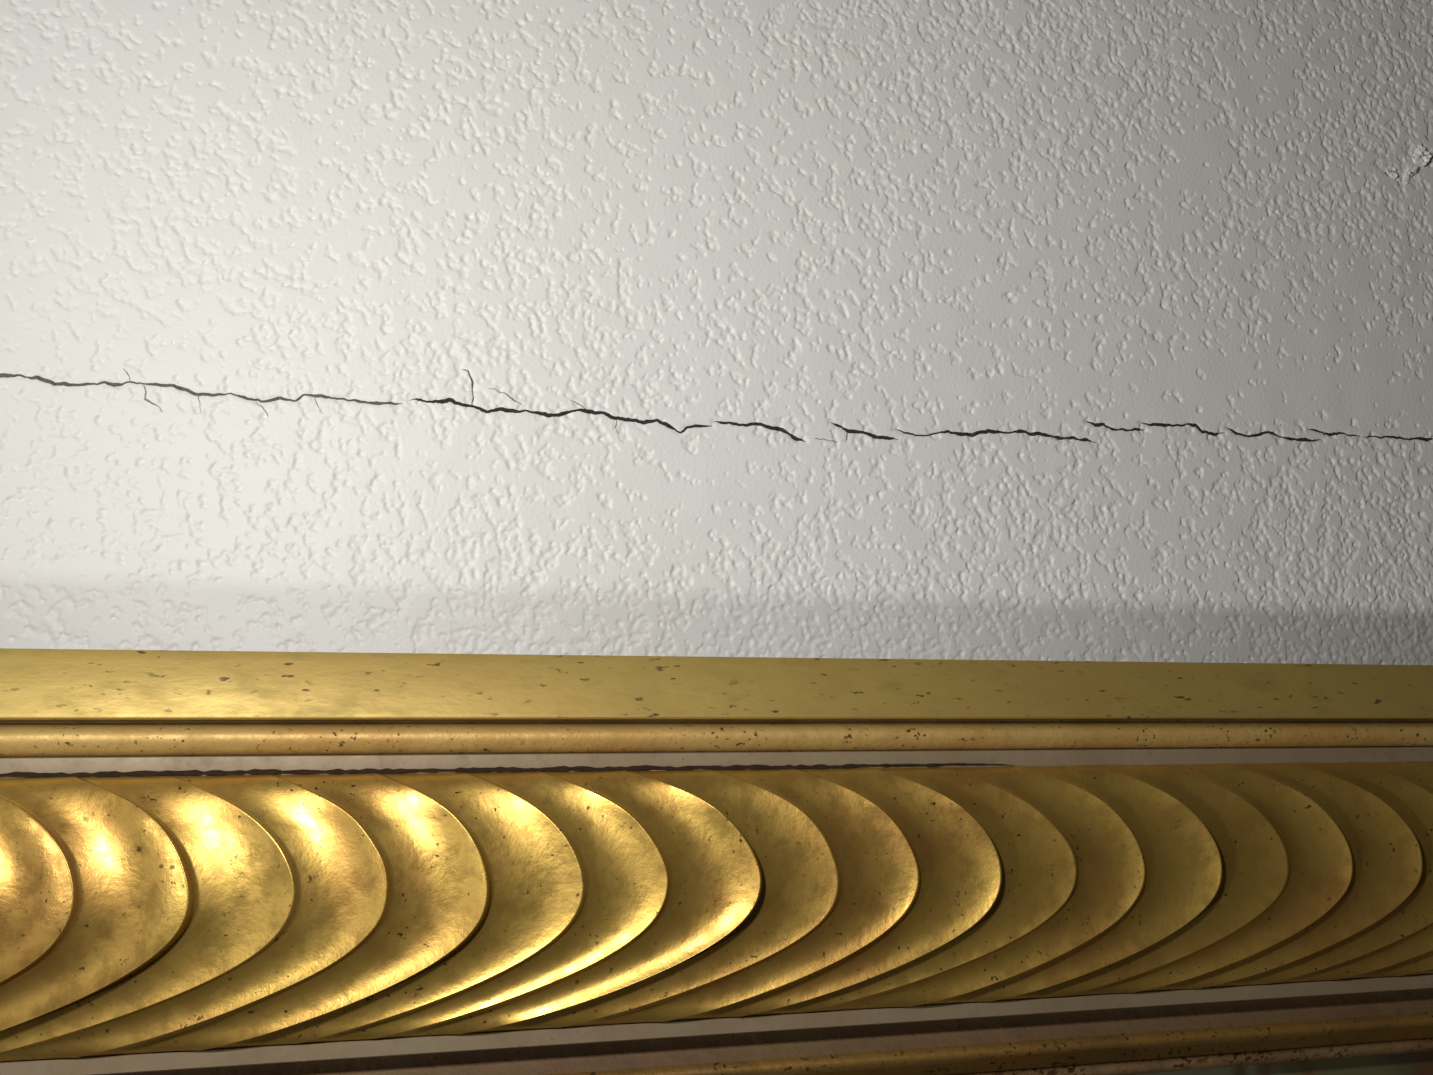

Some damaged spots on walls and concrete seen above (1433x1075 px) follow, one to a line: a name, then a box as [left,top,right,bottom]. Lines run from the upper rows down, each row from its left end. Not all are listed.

peeling [1384,135,1432,184]
crack [0,369,1433,443]